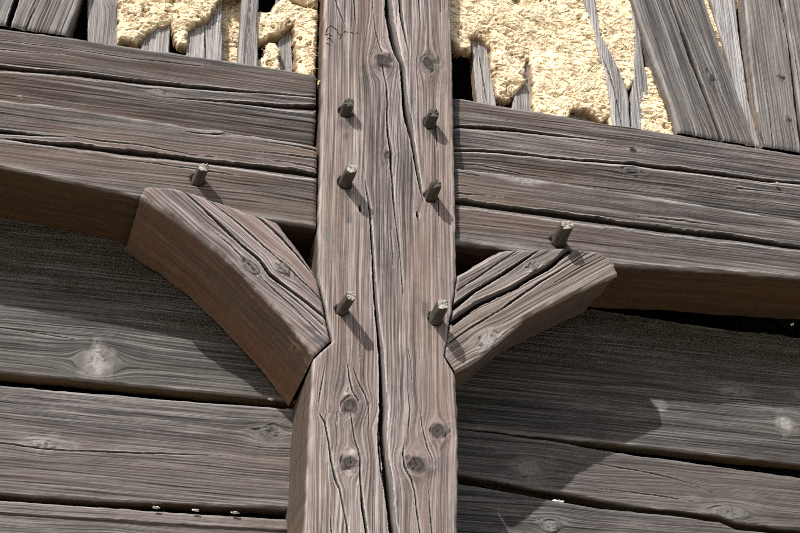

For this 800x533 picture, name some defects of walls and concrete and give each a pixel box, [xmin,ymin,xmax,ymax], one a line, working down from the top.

crack [0,0,316,113]
spalling [117,0,233,54]
spalling [258,19,301,73]
spalling [565,105,612,125]
crack [185,193,325,336]
crack [287,0,800,533]
crack [0,327,103,343]